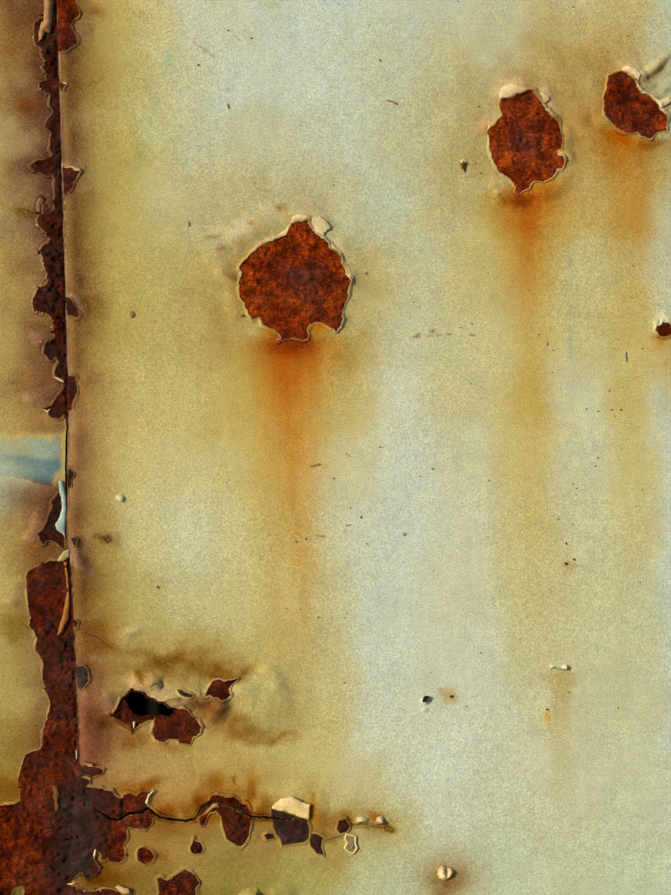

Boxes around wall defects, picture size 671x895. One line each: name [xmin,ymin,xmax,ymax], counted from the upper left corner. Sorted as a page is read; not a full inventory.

peeling [485,84,568,196]
peeling [600,65,671,142]
peeling [235,214,354,345]
peeling [653,318,671,340]
peeling [0,436,201,895]
peeling [106,677,241,746]
crack [94,801,394,844]
peeling [188,791,358,858]